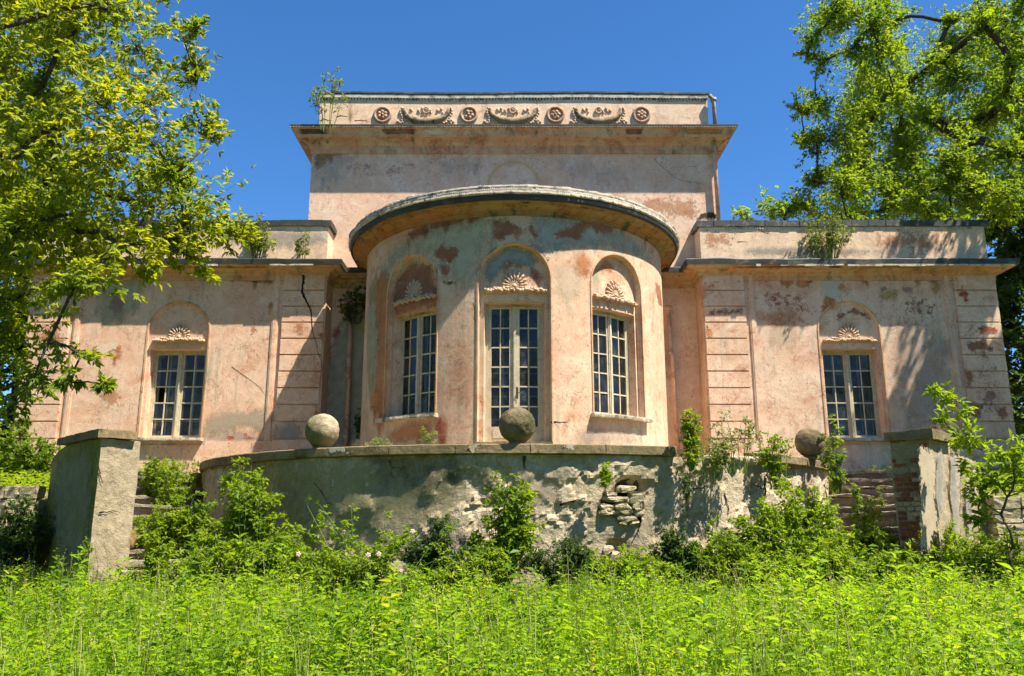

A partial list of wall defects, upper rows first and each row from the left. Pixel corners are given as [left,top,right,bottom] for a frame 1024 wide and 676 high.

peeling [492,218,550,260]
peeling [553,220,615,242]
peeling [763,281,871,322]
peeling [902,286,943,321]
crack [301,275,323,380]
peeling [963,325,1009,420]
spalling [515,461,565,513]
spalling [597,479,646,525]
spalling [892,443,973,565]
spalling [603,540,624,554]